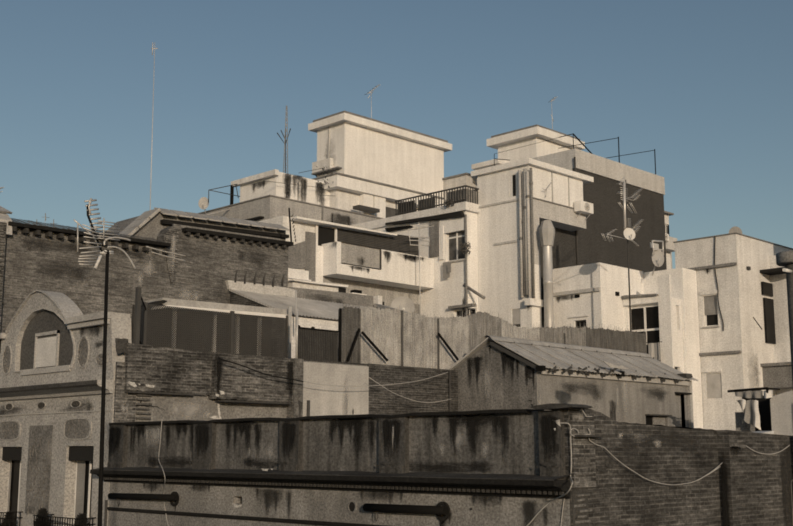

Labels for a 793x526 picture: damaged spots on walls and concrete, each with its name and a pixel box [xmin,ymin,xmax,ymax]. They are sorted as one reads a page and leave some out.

damp [285,174,324,204]
damp [331,214,350,226]
damp [467,357,490,391]
damp [501,350,534,386]
damp [226,422,277,468]
damp [282,423,295,457]
damp [330,418,400,453]
damp [409,414,509,473]